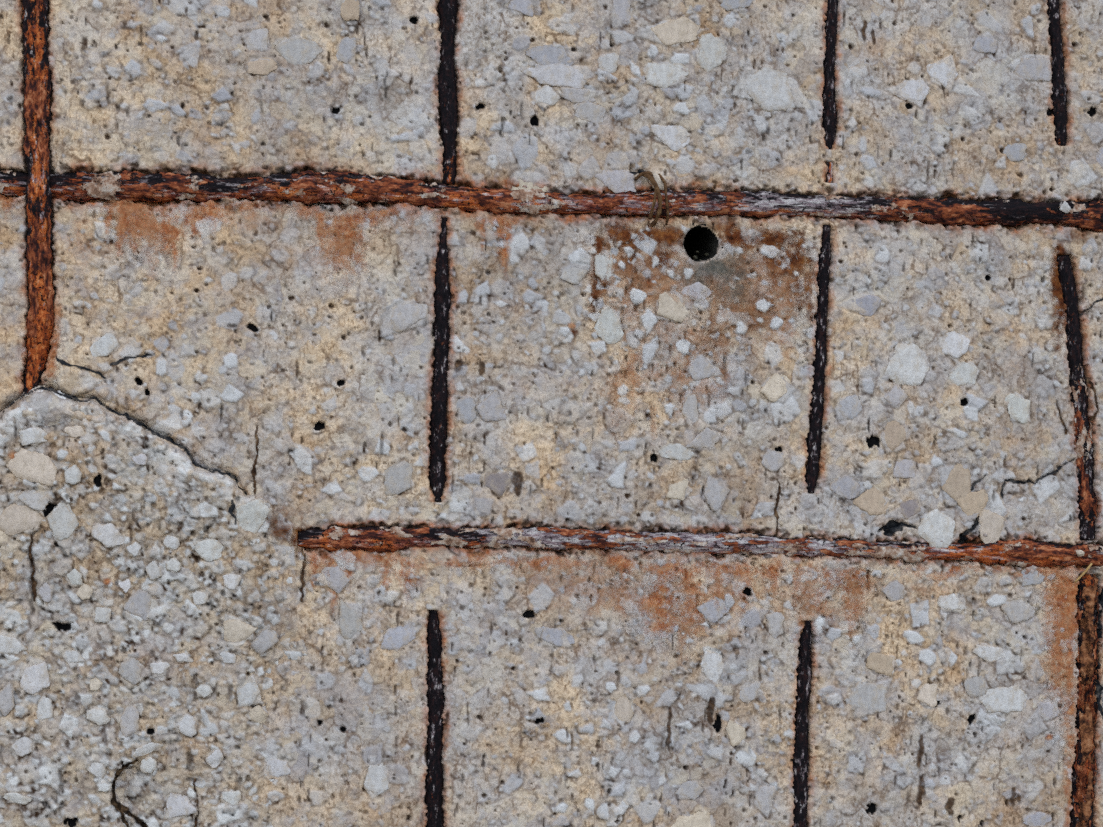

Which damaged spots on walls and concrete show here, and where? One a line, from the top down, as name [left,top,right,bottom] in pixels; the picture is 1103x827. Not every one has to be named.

corrosion [90,199,178,255]
corrosion [591,222,684,299]
corrosion [732,299,764,328]
corrosion [715,221,813,313]
corrosion [1051,244,1073,331]
spalling [0,365,308,827]
corrosion [641,562,724,631]
corrosion [1038,566,1079,692]
crack [111,760,148,827]
crack [192,778,200,827]